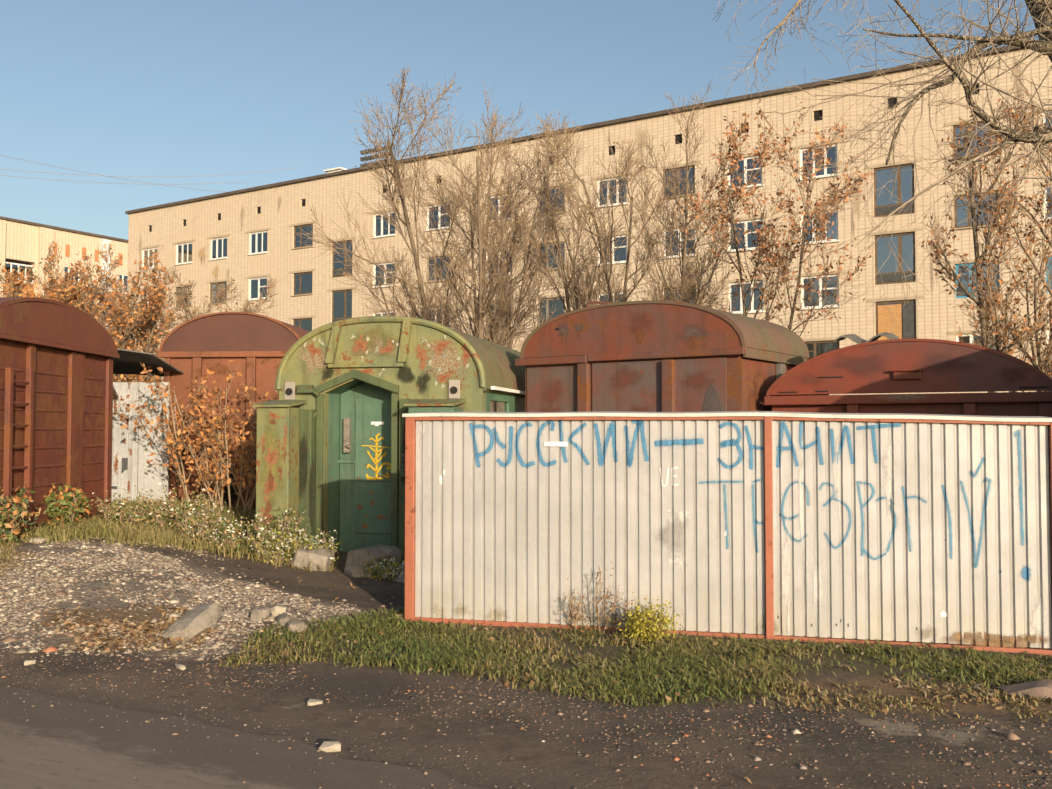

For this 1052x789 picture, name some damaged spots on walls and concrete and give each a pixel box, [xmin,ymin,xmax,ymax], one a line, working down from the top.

rust [749,392,757,411]